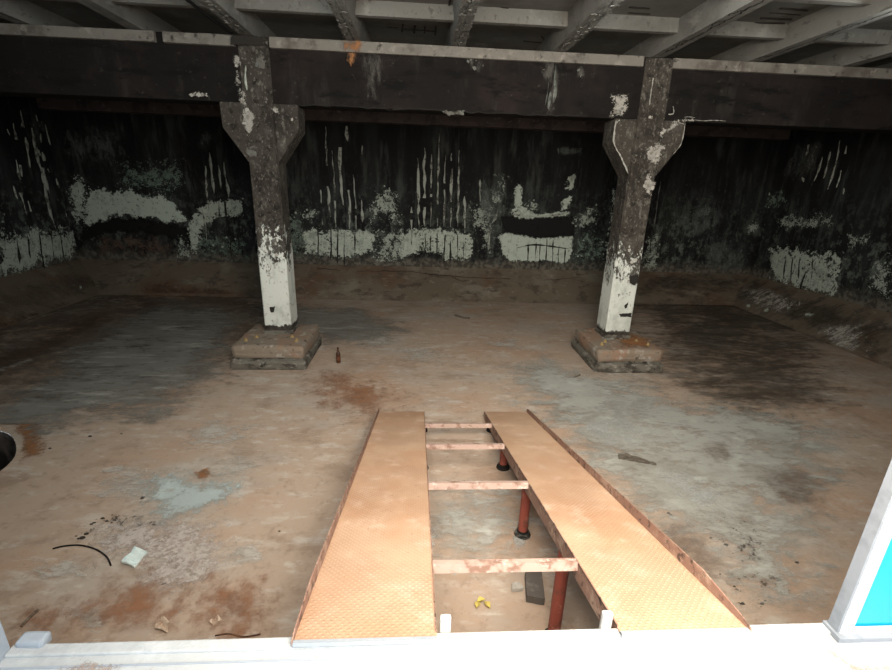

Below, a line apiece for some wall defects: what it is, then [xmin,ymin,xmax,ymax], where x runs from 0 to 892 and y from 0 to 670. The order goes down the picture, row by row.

rust [344,40,361,64]
leakage [7,110,60,228]
leakage [80,218,190,257]
peeling [0,152,475,327]
leakage [320,126,364,229]
leakage [410,136,576,256]
peeling [498,173,661,342]
spalling [647,118,694,164]
rust [16,423,44,457]
leakage [489,283,874,602]